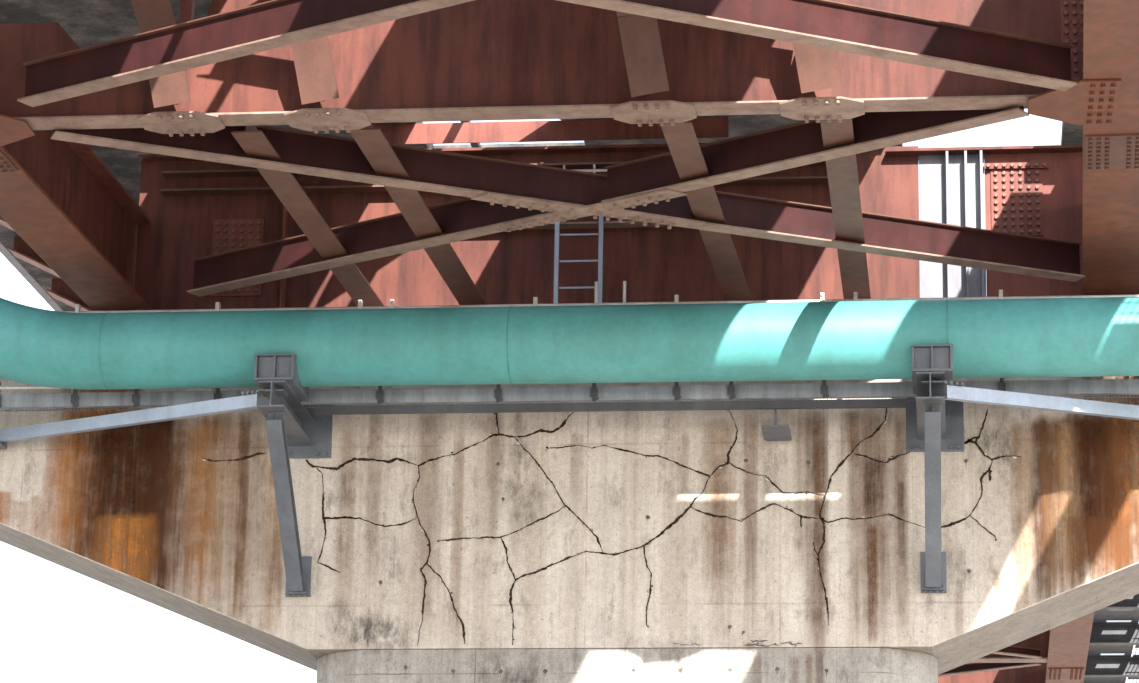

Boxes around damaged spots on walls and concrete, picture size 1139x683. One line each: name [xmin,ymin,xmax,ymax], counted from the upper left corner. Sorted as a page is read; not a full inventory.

rust [69,407,128,419]
rust [51,418,249,603]
crack [202,452,266,462]
crack [306,408,1021,646]
rust [1014,418,1139,589]
rust [1084,395,1139,406]